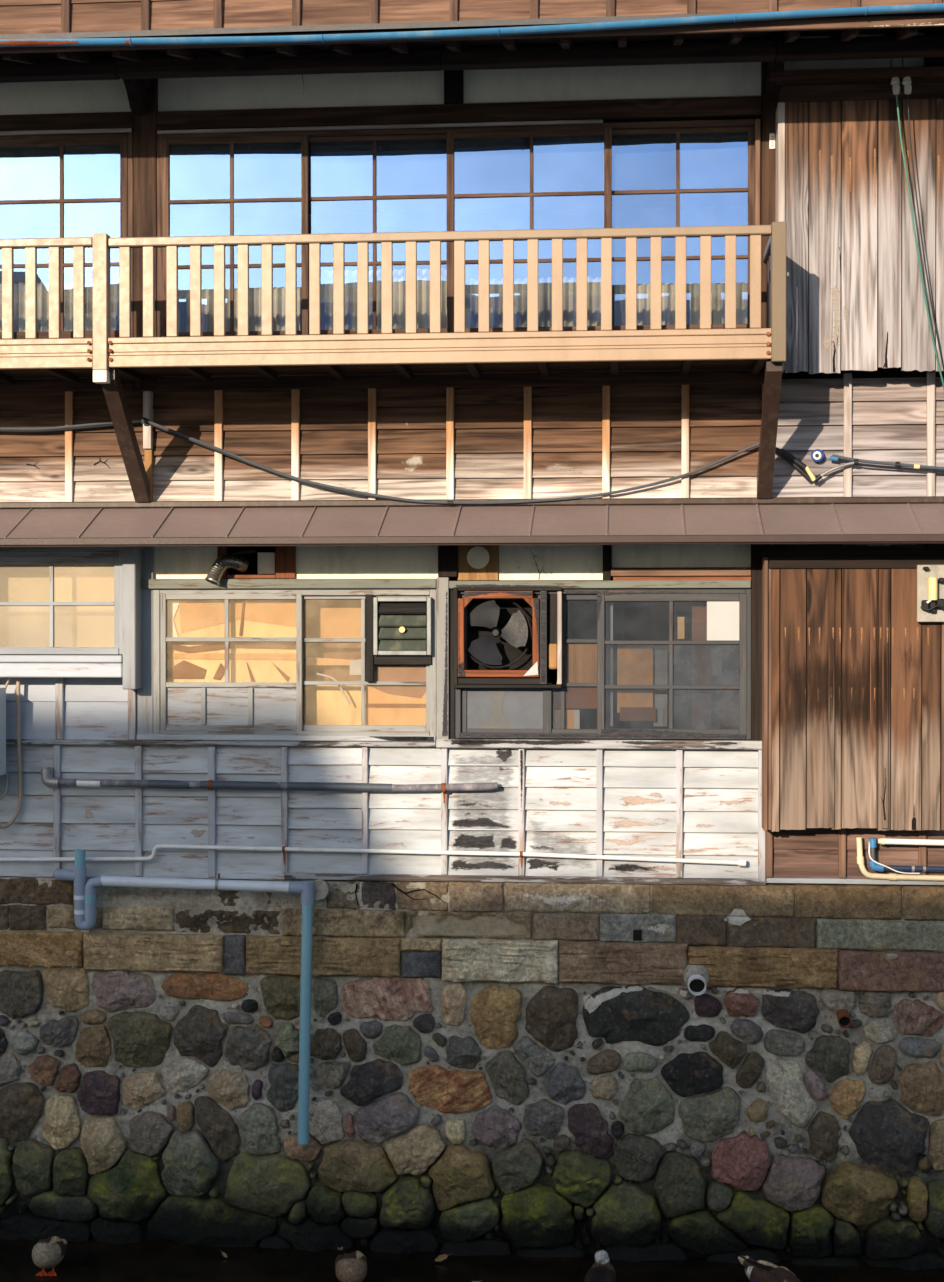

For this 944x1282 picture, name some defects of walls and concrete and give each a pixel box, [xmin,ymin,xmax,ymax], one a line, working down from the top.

peeling [607,792,669,851]
crack [390,883,445,903]